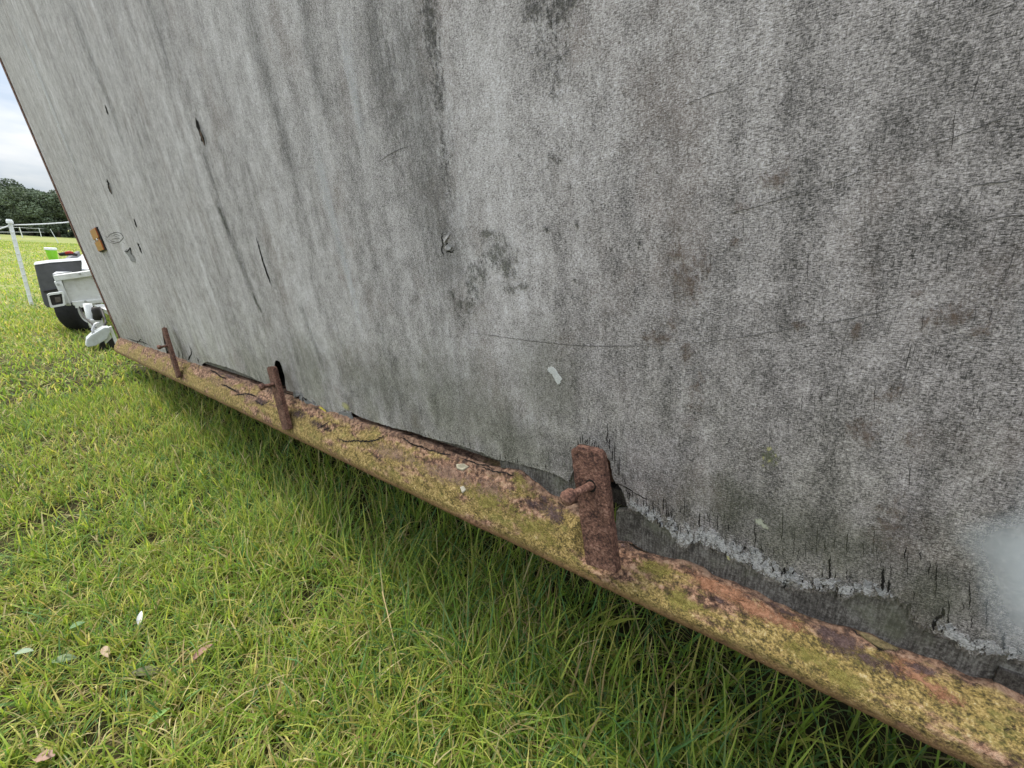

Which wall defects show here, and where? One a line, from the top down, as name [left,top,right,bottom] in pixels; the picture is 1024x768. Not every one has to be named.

corrosion [525,495,564,525]
water stain [630,499,877,597]
peeling [629,502,893,598]
crack [572,424,1006,656]
corrosion [692,573,966,707]
water stain [941,627,1017,658]
peeling [937,623,1024,660]